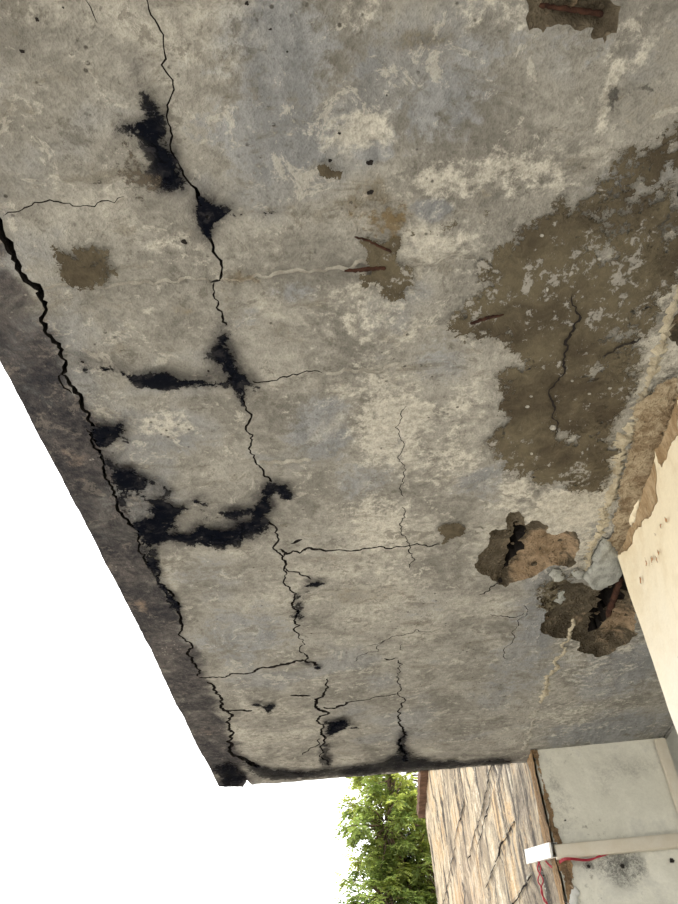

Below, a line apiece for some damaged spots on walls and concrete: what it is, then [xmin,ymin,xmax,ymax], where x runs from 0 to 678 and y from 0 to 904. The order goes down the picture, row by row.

spalling [526,0,621,43]
leakage [115,91,188,201]
leakage [100,325,260,407]
crack [147,0,227,325]
leakage [195,195,242,239]
peeling [344,232,415,302]
peeling [445,121,678,555]
leakage [90,421,295,613]
crack [0,196,437,767]
spalling [438,511,638,657]